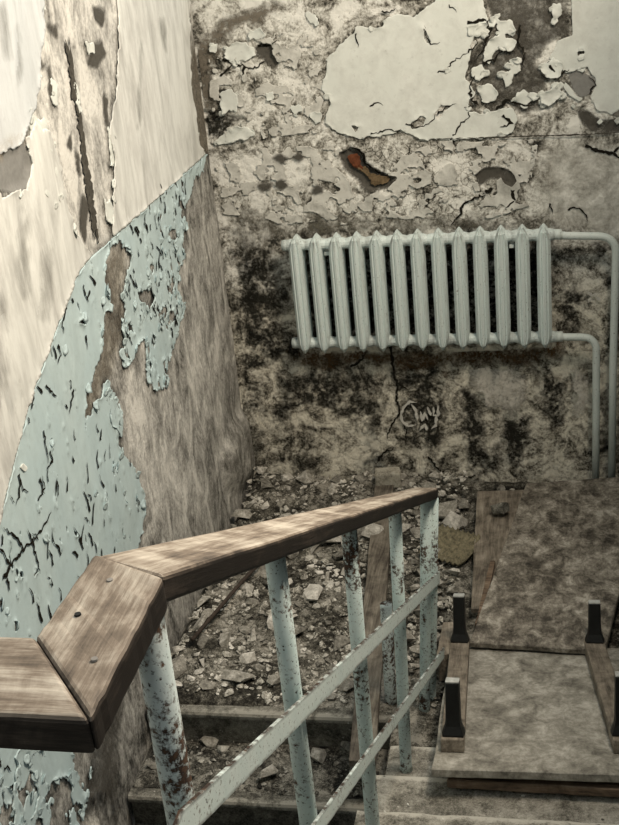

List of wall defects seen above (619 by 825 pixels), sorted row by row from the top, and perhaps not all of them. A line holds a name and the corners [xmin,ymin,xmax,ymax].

crack [438,38,478,73]
crack [371,104,619,158]
leakage [227,211,370,360]
peeling [0,0,619,641]
leakage [405,246,415,335]
leakage [425,245,436,334]
leakage [446,244,456,334]
leakage [467,243,476,333]
leakage [508,242,517,332]
crack [32,384,74,410]
crack [0,431,58,590]
peeling [0,748,93,825]